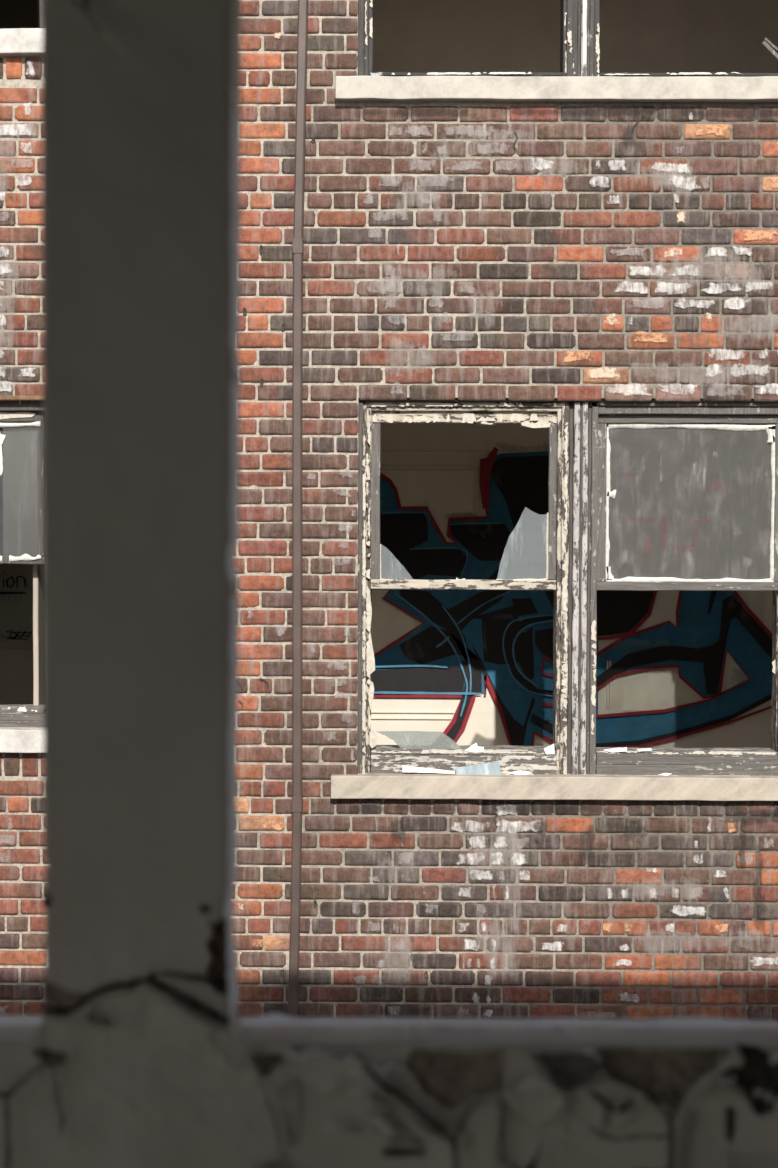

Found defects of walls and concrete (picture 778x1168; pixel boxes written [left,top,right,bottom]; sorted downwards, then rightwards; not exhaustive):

peeling [564,0,649,76]
water stain [0,103,32,152]
water stain [590,160,625,204]
water stain [652,163,699,203]
water stain [615,247,772,309]
water stain [609,349,778,395]
peeling [362,402,596,763]
peeling [600,747,776,755]
water stain [452,805,541,899]
water stain [542,924,567,951]
water stain [647,886,706,952]
crack [43,971,231,1024]